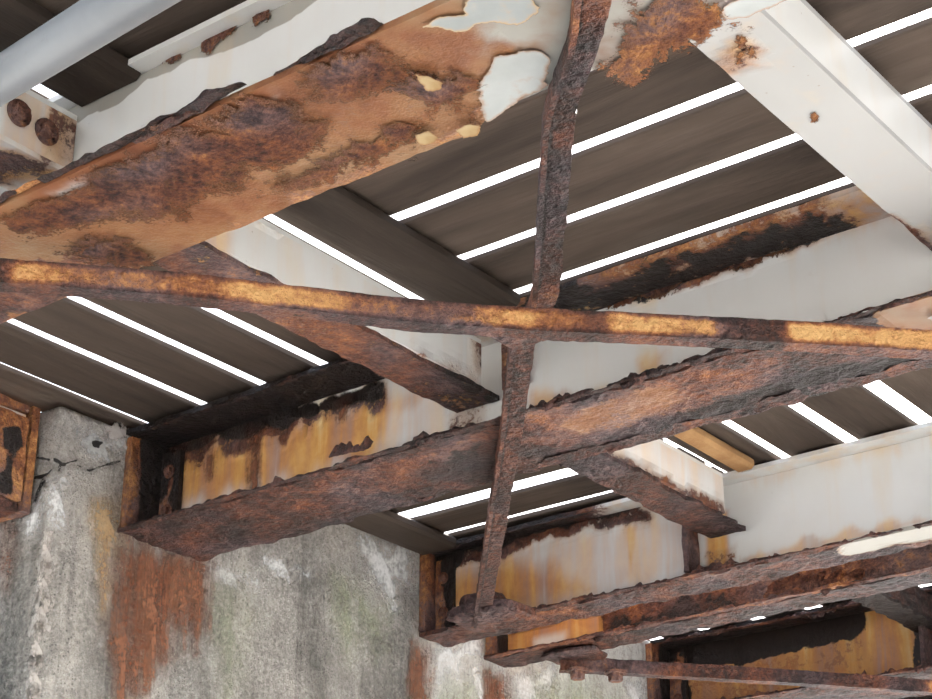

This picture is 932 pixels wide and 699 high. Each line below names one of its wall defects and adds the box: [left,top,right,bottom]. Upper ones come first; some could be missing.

peeling [423,0,540,32]
rust [597,0,759,88]
peeling [416,74,443,92]
peeling [456,50,551,138]
rust [0,22,484,269]
peeling [415,131,439,145]
peeling [824,296,925,324]
rust [529,388,594,412]
rust [329,436,373,458]
crack [34,456,120,502]
rust [841,521,932,545]
rust [763,568,870,619]